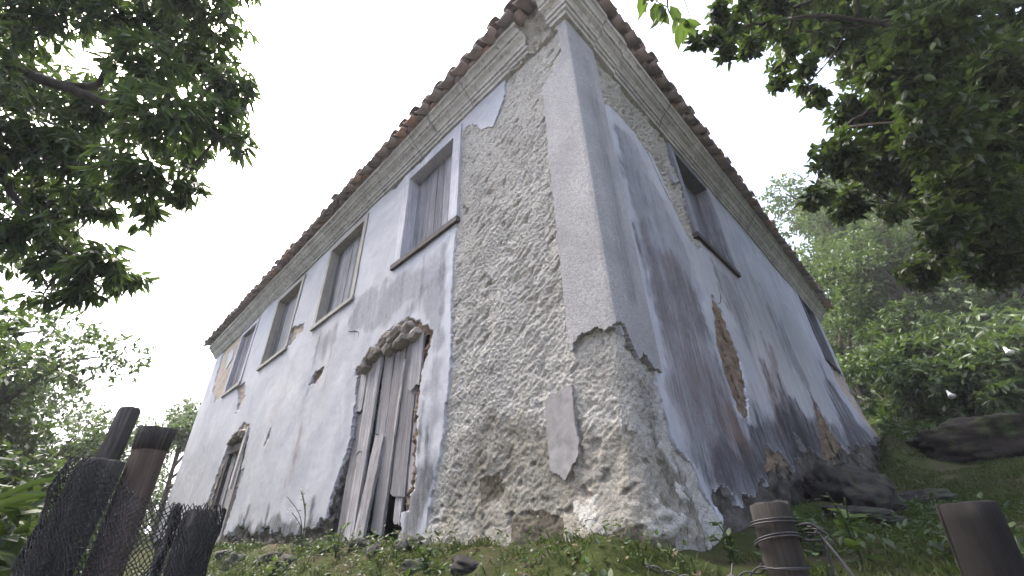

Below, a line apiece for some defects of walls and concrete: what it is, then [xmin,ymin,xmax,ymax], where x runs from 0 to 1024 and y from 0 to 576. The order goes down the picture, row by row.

flaking render [213,335,246,410]
spalling [400,318,434,511]
spalling [423,33,882,552]
leakage [653,254,873,499]